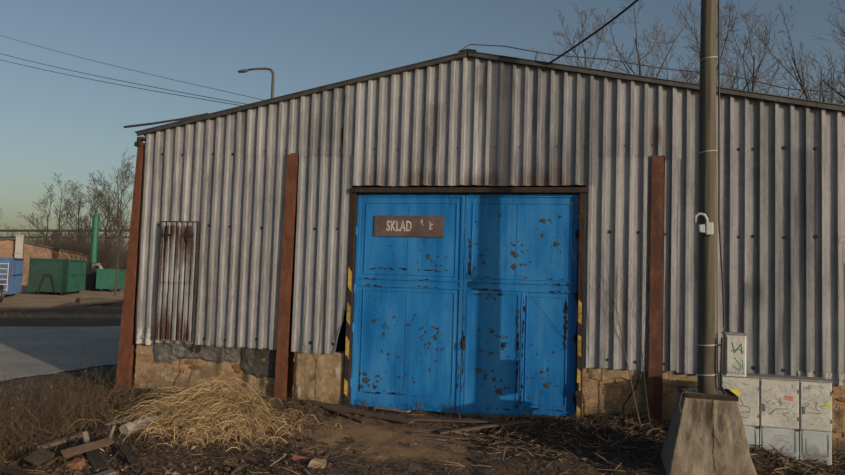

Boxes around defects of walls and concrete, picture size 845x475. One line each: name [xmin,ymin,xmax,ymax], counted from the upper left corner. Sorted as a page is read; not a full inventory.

rust [160,225,194,275]
peeling [467,237,491,279]
peeling [504,240,531,285]
peeling [544,278,571,349]
spalling [153,342,276,378]
peeling [359,371,415,395]
peeling [367,309,444,371]
peeling [473,299,565,412]
crack [711,425,719,473]